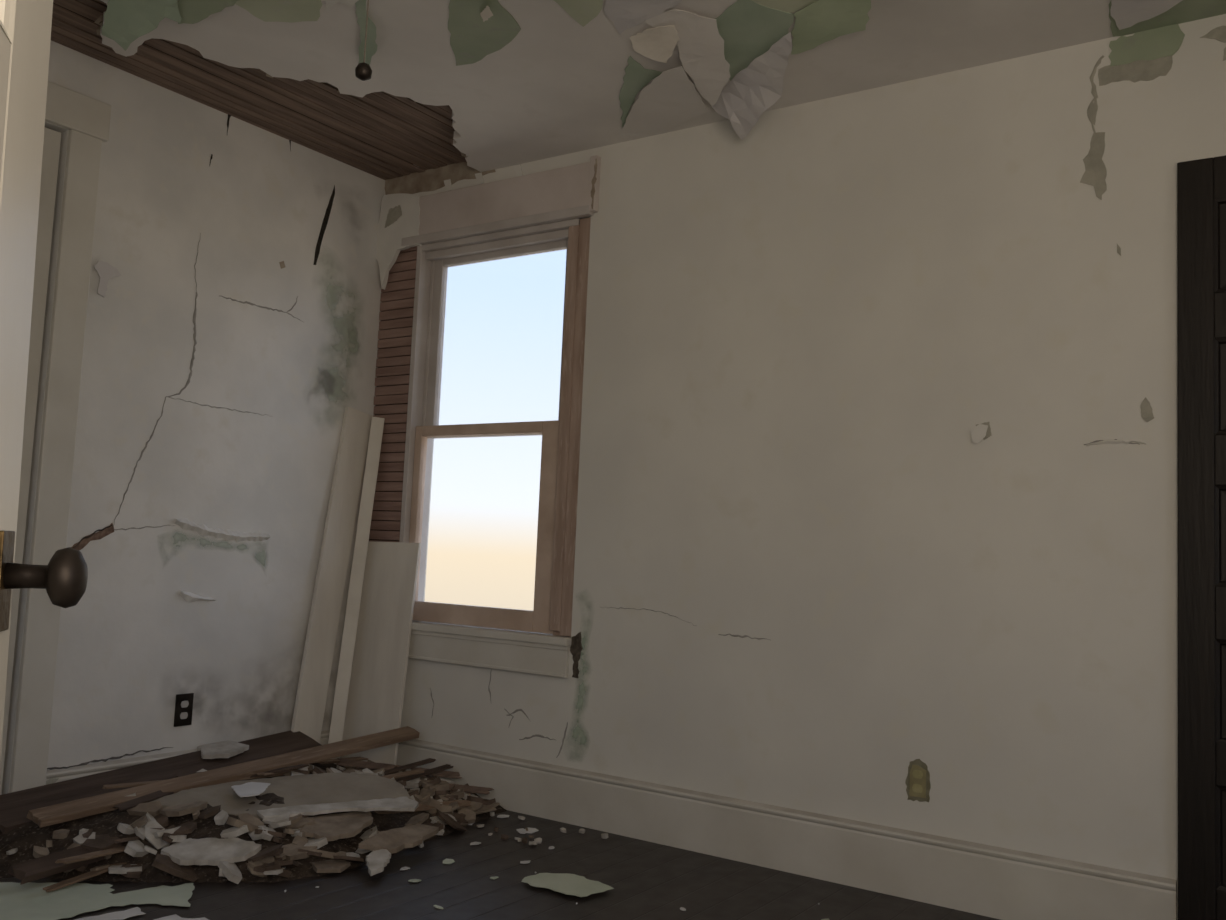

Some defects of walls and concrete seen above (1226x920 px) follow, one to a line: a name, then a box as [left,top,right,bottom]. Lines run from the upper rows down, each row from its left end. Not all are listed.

peeling [102,0,377,65]
peeling [448,0,521,66]
peeling [619,0,871,140]
spalling [1098,0,1226,86]
crack [113,233,303,530]
spalling [905,759,931,802]